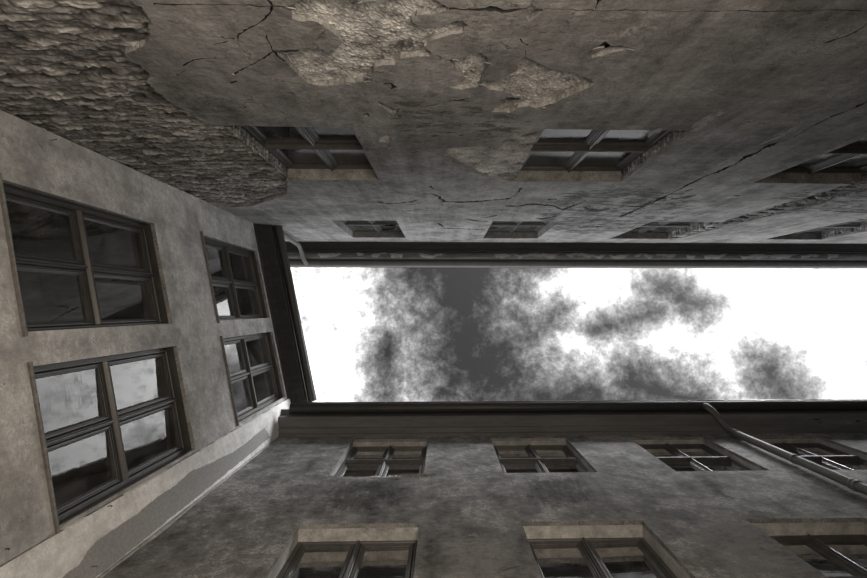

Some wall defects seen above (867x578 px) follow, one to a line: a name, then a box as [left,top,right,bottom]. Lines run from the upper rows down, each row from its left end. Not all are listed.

crack [153,0,299,84]
spalling [282,0,465,86]
crack [448,5,525,13]
crack [548,0,866,43]
spalling [0,0,305,205]
crack [620,102,866,216]
crack [378,186,602,230]
spalling [670,176,867,238]